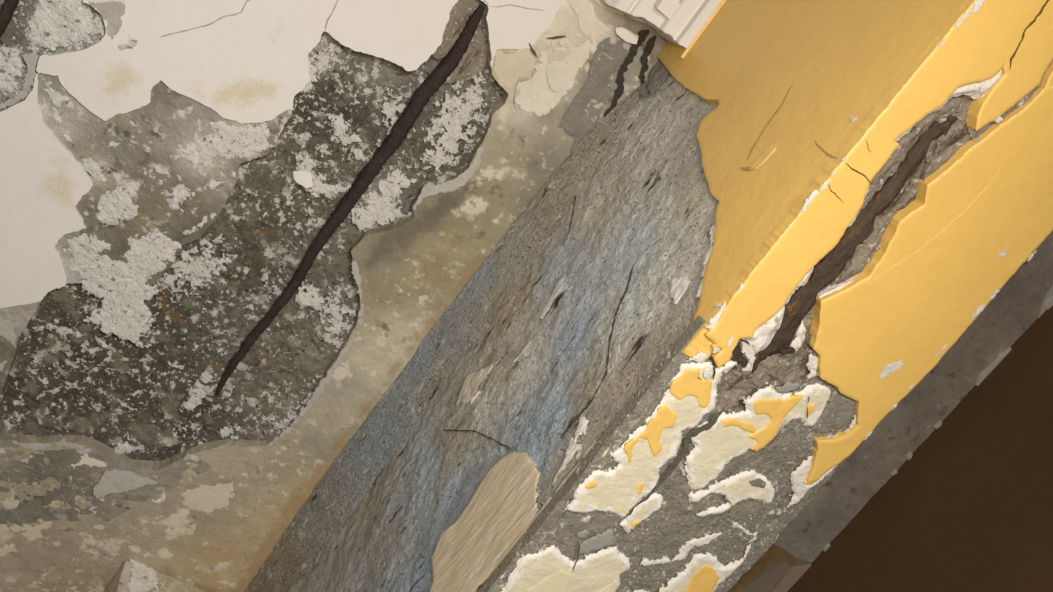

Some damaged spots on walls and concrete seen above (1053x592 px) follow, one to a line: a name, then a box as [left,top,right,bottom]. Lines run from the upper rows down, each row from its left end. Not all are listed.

crack [161,0,249,37]
crack [1010,0,1050,68]
crack [968,59,1053,143]
crack [814,140,872,184]
spalling [0,0,668,592]
peeling [245,59,1053,592]